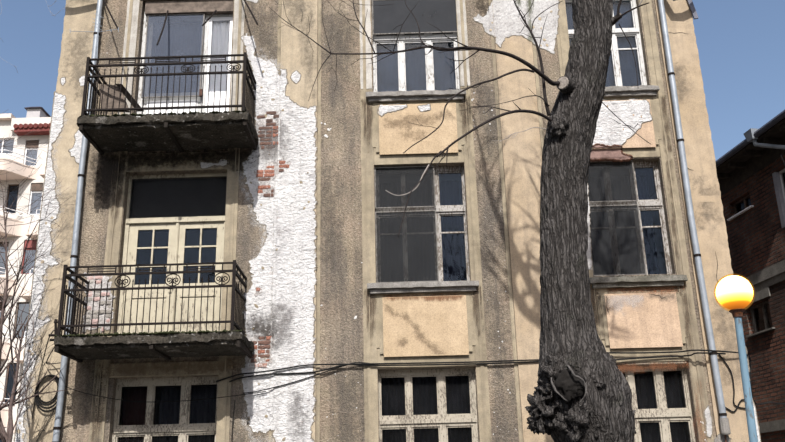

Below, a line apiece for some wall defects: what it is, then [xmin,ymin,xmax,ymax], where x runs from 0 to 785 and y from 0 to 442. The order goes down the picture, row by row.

peeling [472,0,560,55]
peeling [377,103,431,117]
peeling [590,98,653,162]
water stain [90,129,283,216]
peeling [14,77,67,442]
peeling [240,33,331,442]
water stain [247,305,287,344]
peeling [700,405,732,442]
peeling [753,402,761,442]